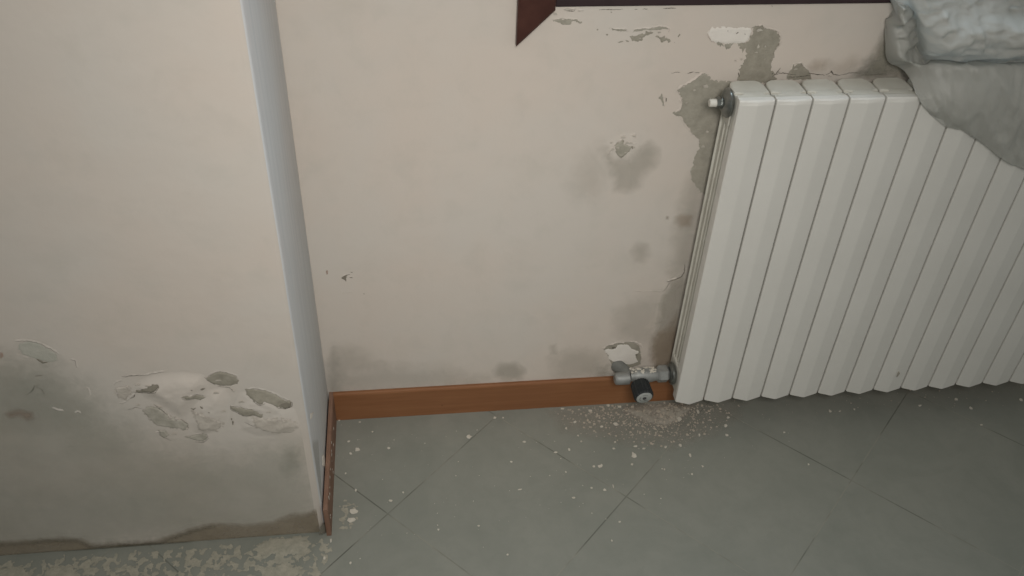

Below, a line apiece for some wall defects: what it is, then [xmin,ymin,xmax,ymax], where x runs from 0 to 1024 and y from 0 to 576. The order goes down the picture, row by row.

peeling [597,25,680,43]
flaking render [659,23,811,195]
flaking render [602,340,643,367]
damp [163,513,320,544]
damp [0,541,136,556]